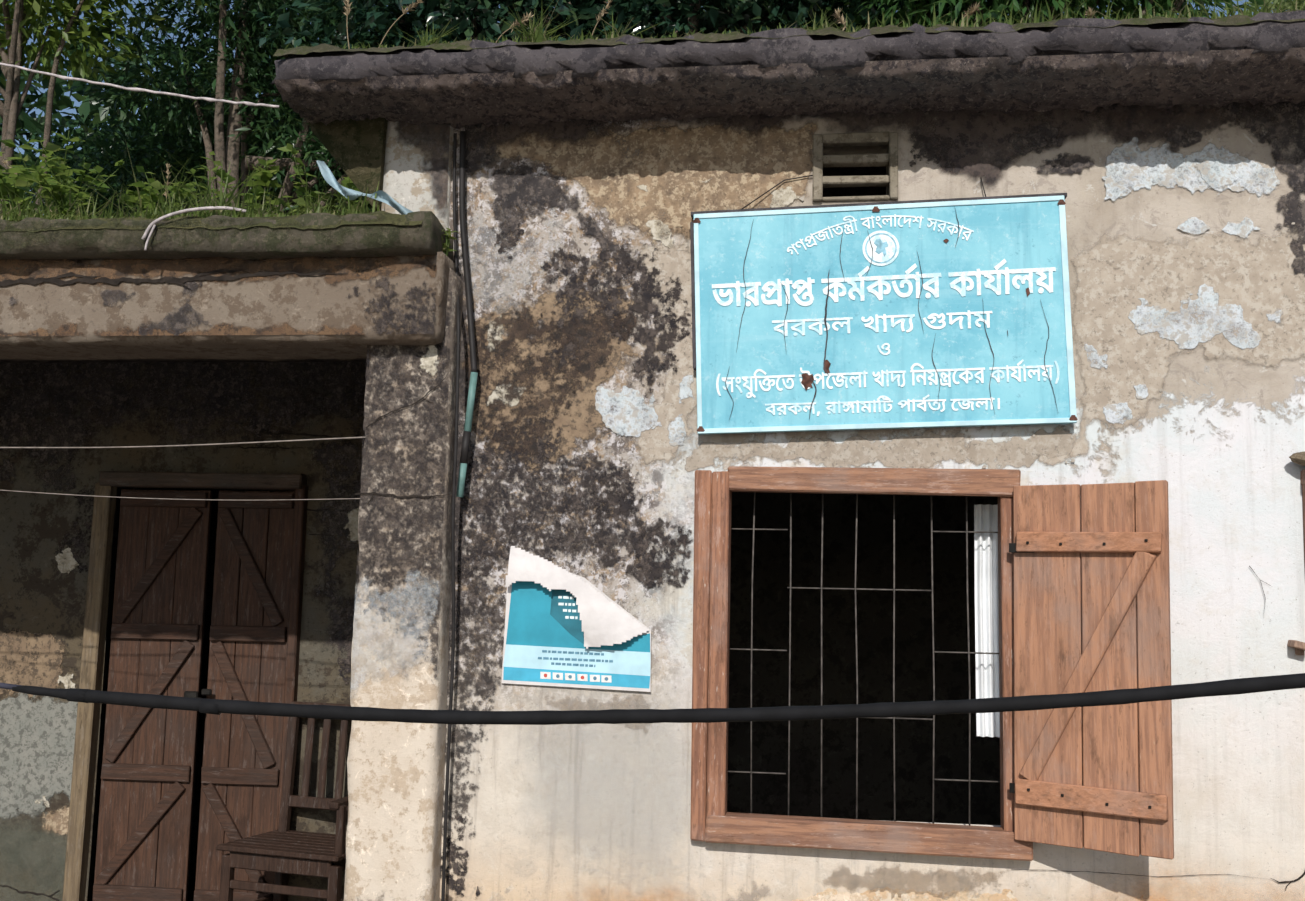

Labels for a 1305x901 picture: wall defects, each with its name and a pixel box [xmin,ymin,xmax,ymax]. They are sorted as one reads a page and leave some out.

water stain [668,101,1305,275]
spalling [274,47,1305,472]
crack [0,269,348,291]
water stain [0,119,693,901]
peeling [342,508,359,542]
peeling [55,547,79,573]
peeling [0,630,78,835]
flaking render [805,892,869,901]
crack [1011,869,1305,891]